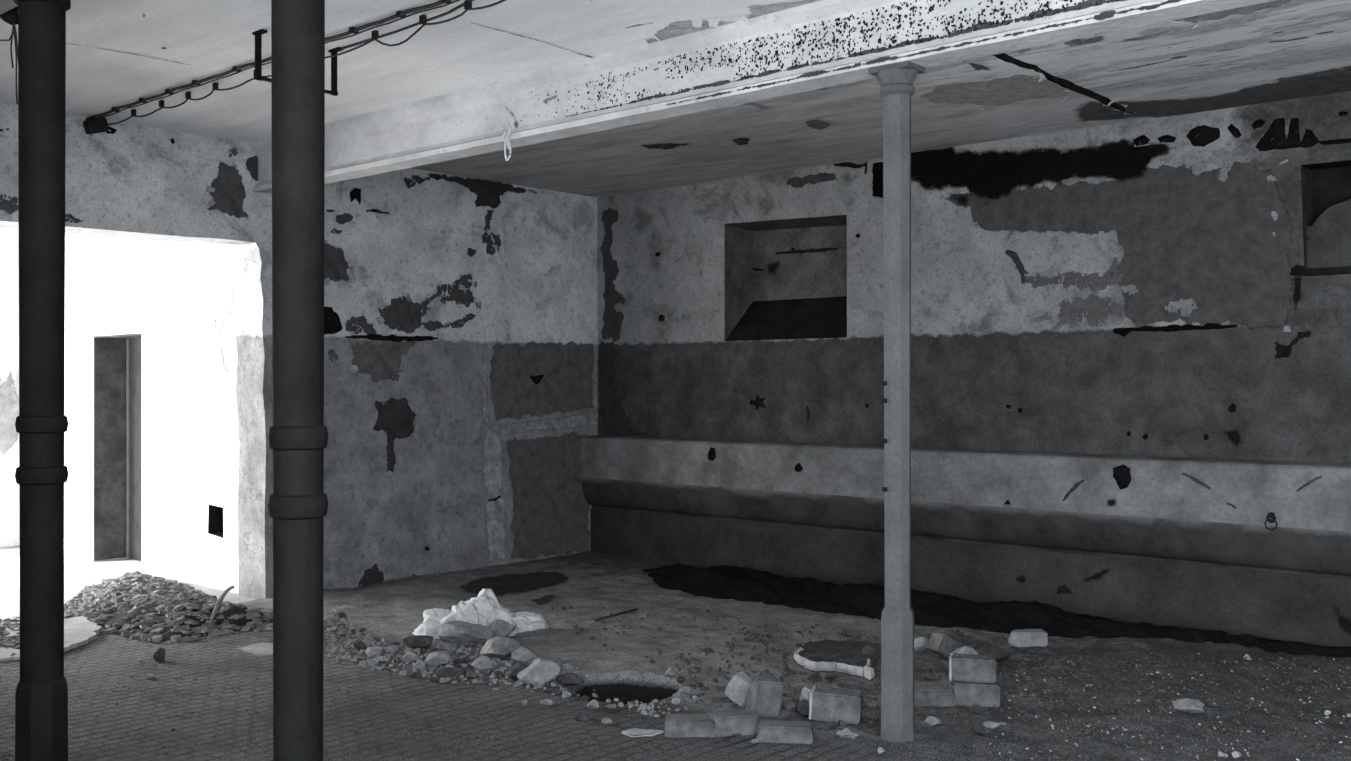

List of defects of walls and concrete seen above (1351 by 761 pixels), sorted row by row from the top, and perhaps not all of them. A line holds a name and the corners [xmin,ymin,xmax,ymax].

peeling [1171,0,1291,29]
peeling [0,193,18,214]
peeling [206,148,258,219]
peeling [945,118,1351,332]
peeling [324,273,481,382]
peeling [373,397,419,479]